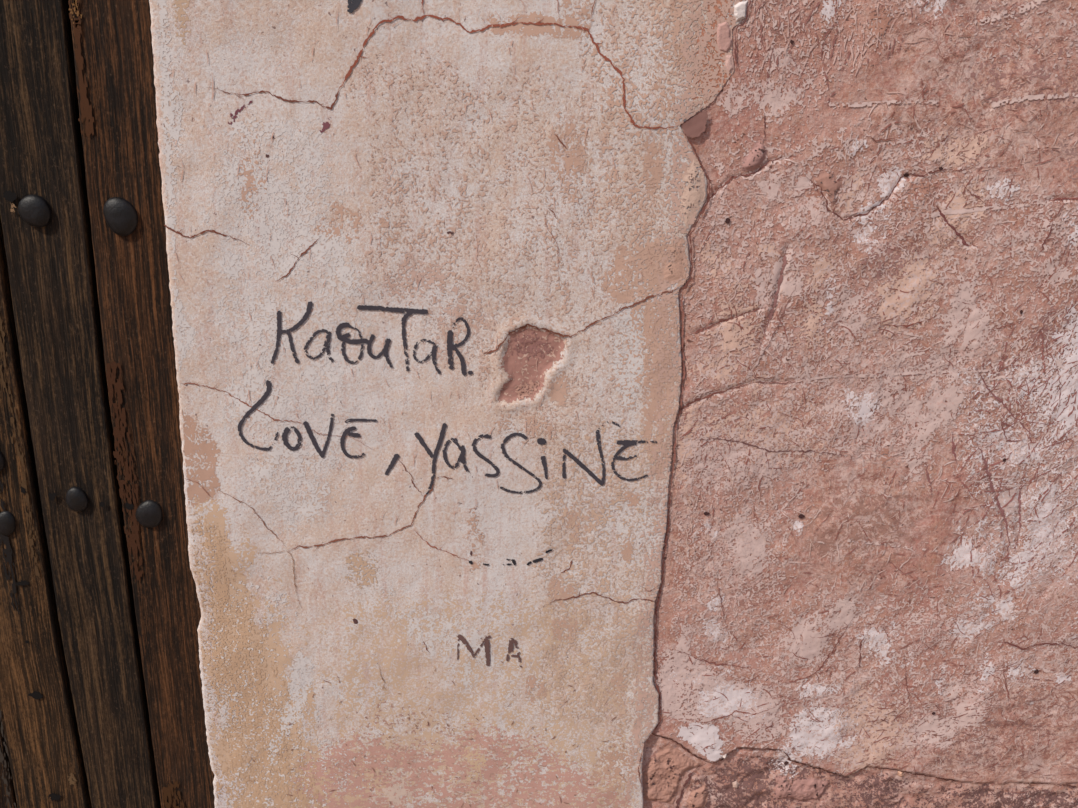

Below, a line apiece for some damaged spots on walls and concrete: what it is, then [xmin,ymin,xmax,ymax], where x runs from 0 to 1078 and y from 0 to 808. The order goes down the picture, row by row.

crack [164,225,247,244]
spalling [498,325,565,403]
crack [184,0,995,790]
spalling [682,755,1078,808]